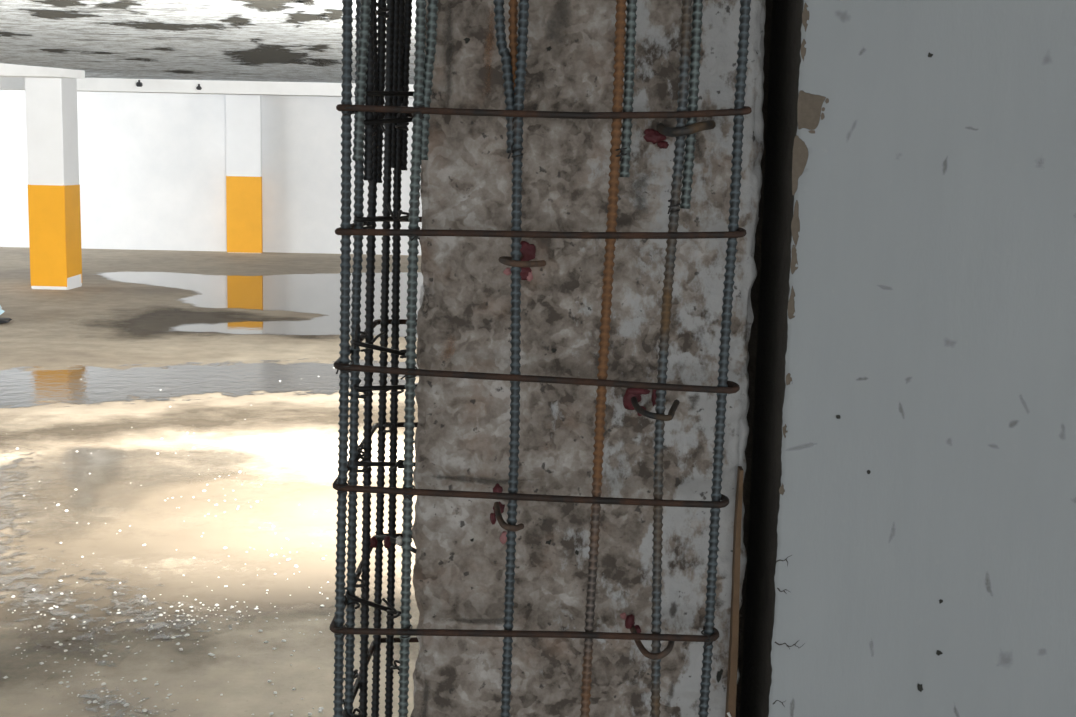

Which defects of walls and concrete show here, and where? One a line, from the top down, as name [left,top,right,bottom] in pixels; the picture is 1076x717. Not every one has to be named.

peeling [788,90,829,319]
spalling [420,285,435,317]
water stain [437,475,508,484]